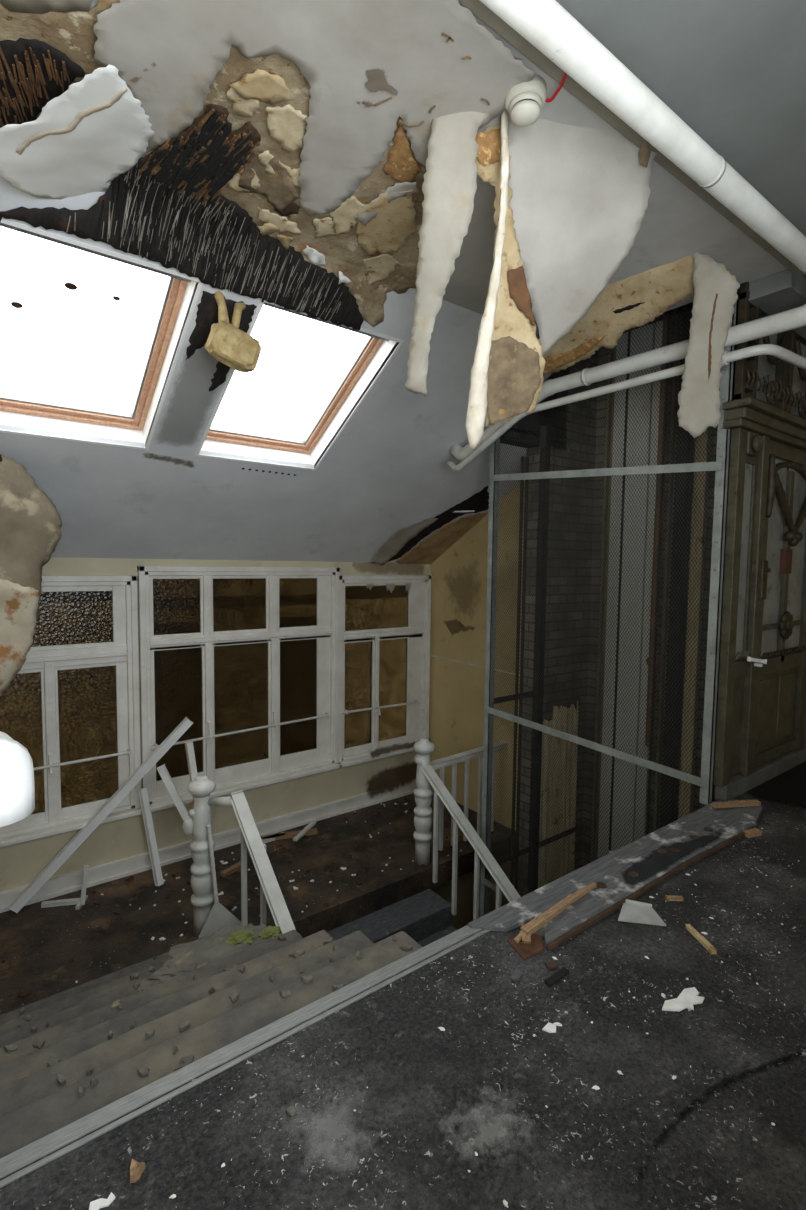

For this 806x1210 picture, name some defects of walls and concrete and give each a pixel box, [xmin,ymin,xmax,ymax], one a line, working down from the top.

peeling [0,0,120,83]
peeling [183,44,427,327]